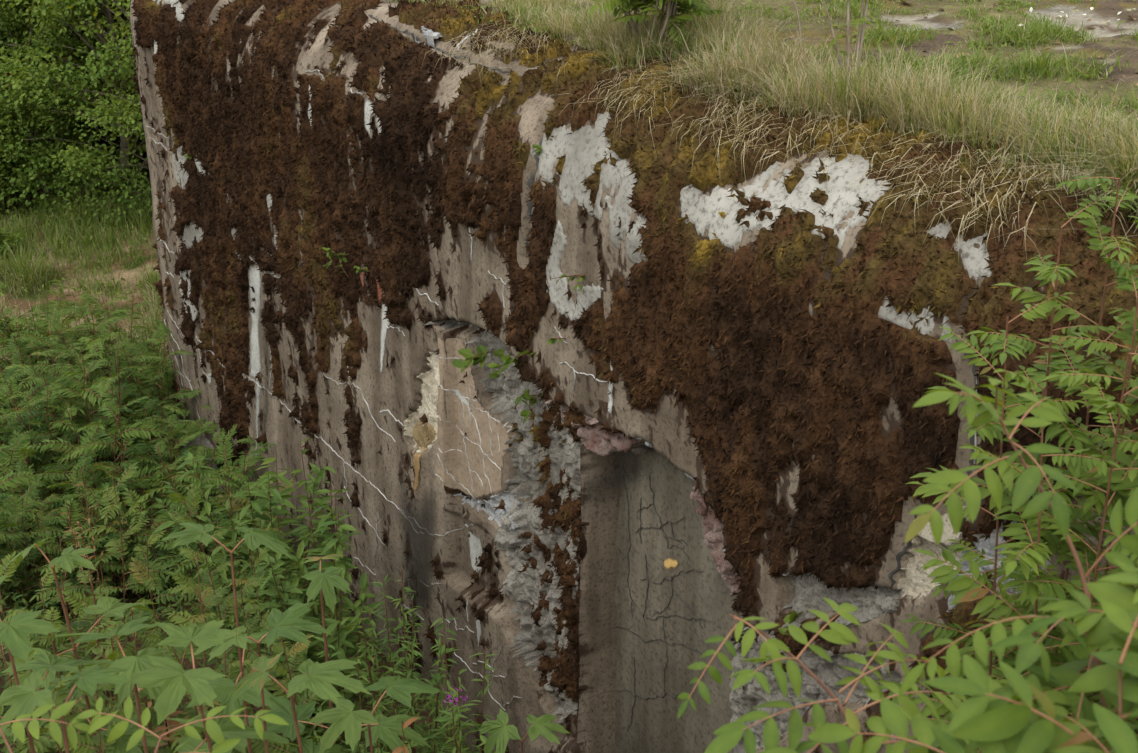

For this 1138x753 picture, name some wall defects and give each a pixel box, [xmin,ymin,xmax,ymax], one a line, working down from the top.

crack [164,310,406,575]
spalling [403,350,440,454]
crack [404,601,522,711]
crack [428,339,512,536]
spalling [425,320,653,724]
crack [587,475,705,732]